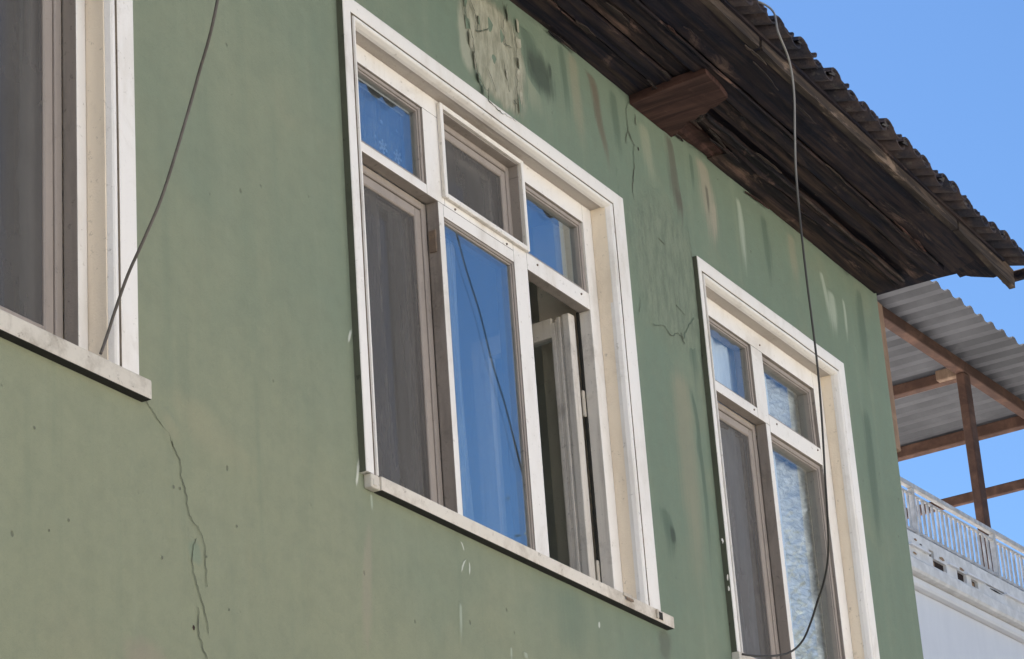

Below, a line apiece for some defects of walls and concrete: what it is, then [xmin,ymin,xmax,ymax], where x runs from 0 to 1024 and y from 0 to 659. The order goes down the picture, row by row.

flaking render [450,0,534,132]
crack [626,101,636,200]
damp [733,192,805,307]
crack [148,404,209,656]